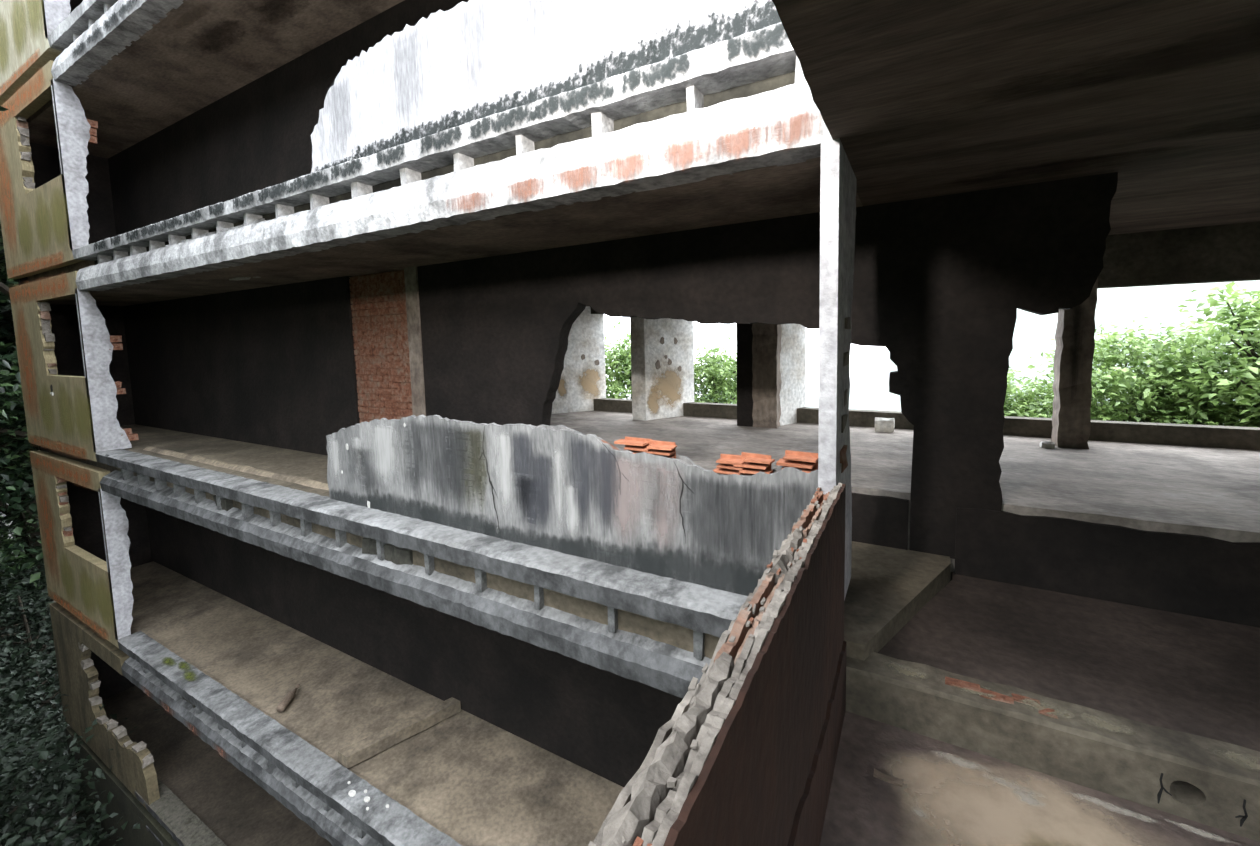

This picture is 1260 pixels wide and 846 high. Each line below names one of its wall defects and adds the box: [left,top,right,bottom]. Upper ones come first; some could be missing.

damp [93,0,788,251]
rust [452,190,492,211]
rust [511,177,543,200]
rust [560,112,812,189]
spalling [713,450,818,475]
damp [330,424,808,596]
peeling [765,487,838,575]
spalling [78,642,154,768]
peeling [688,663,708,691]